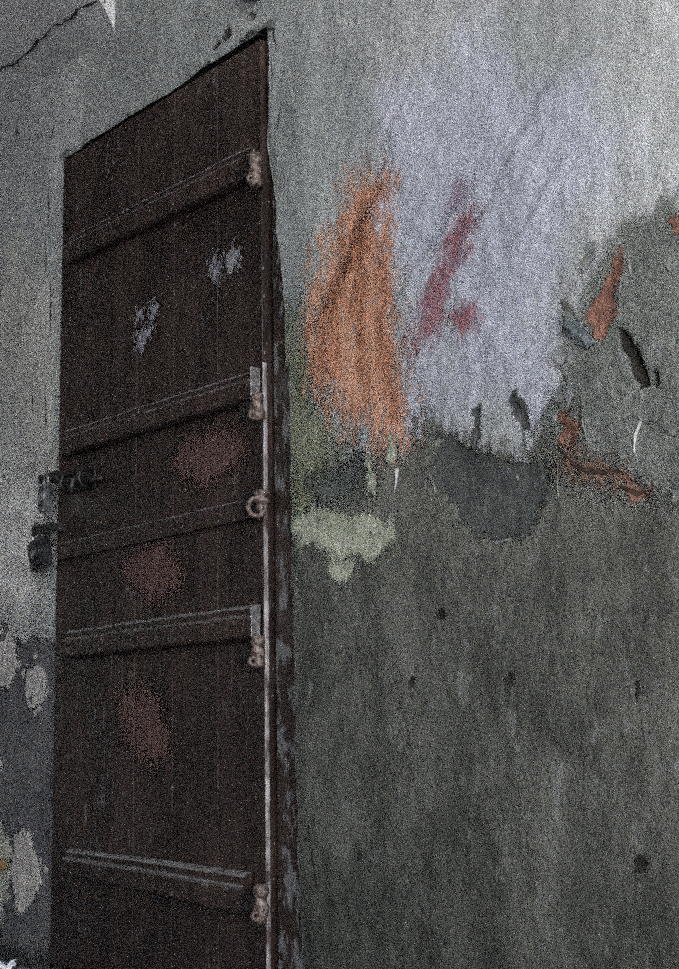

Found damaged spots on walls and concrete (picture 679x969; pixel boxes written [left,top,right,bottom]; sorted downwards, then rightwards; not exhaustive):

crack [0,0,106,72]
flaking render [290,196,679,969]
flaking render [0,621,56,968]